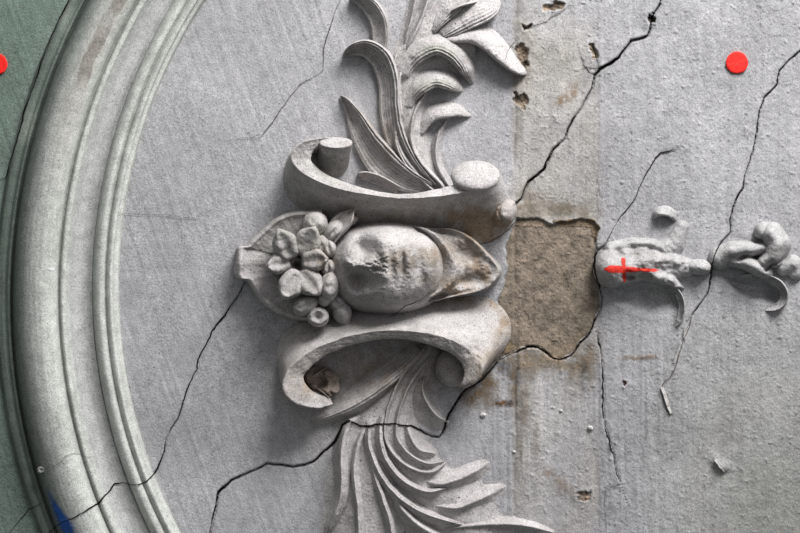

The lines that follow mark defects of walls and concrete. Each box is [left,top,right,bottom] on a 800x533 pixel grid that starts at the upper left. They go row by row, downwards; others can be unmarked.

crack [251,2,340,138]
spalling [513,92,529,110]
spalling [515,43,529,69]
spalling [542,1,565,11]
crack [484,0,661,244]
crack [688,50,800,326]
crack [49,284,244,533]
crack [210,149,677,529]
spalling [498,218,600,359]